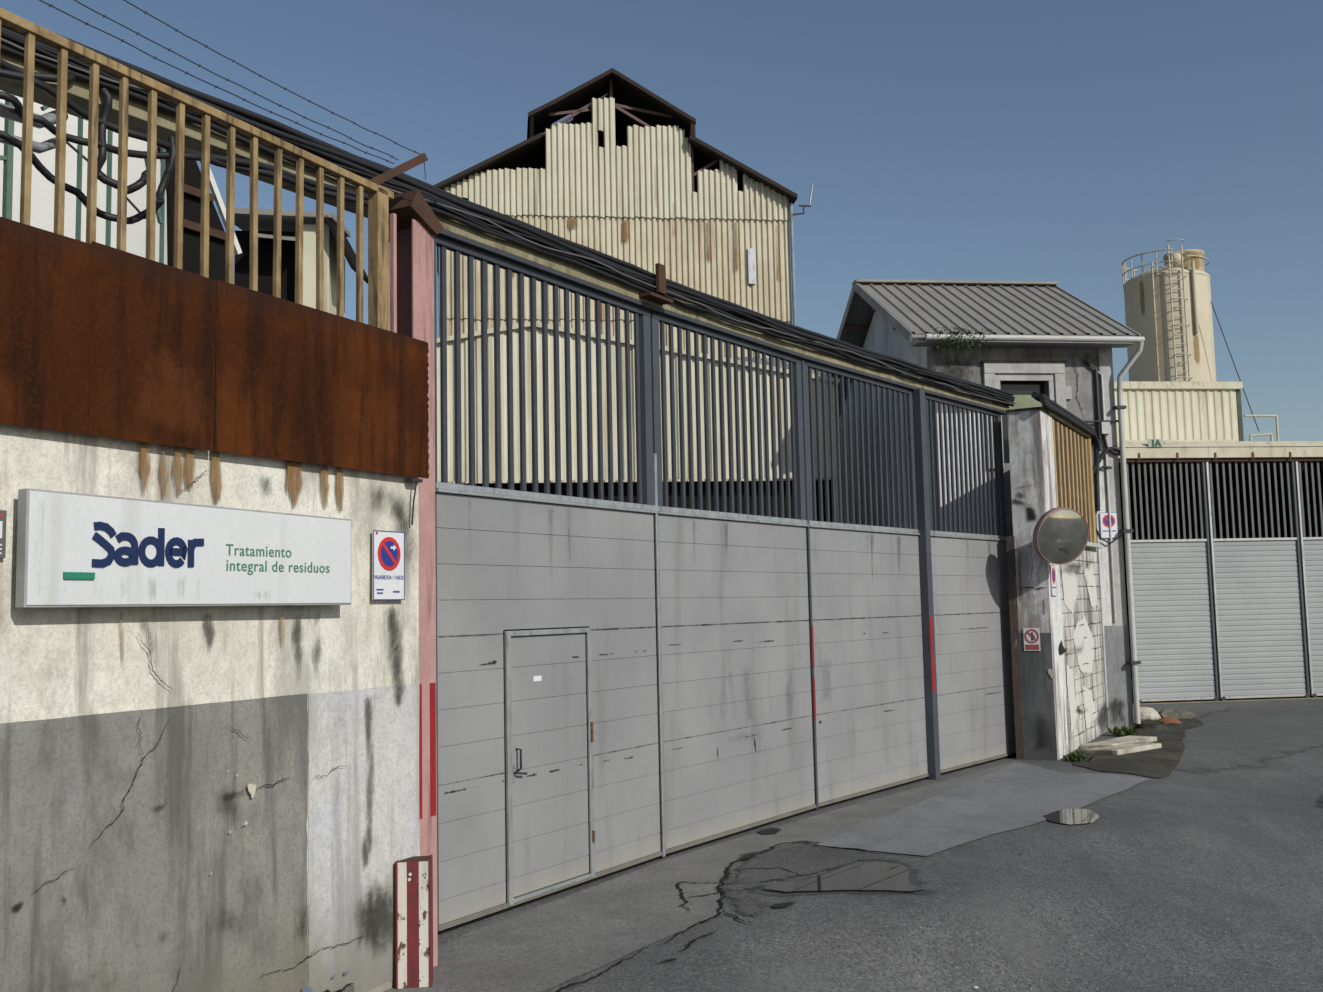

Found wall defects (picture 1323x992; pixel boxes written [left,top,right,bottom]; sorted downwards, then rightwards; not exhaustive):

corrosion [0,217,429,511]
leakage [390,606,403,704]
crack [32,637,174,895]
leakage [364,698,374,865]
leakage [360,888,396,949]